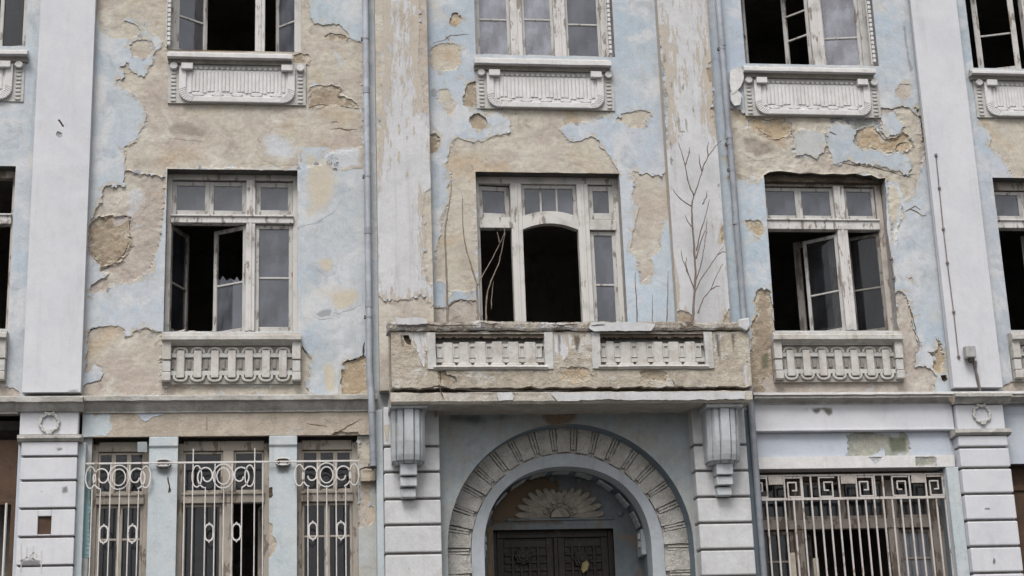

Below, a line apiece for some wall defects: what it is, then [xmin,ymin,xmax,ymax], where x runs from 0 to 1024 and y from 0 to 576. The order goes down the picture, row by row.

peeling [704,48,717,137]
peeling [82,0,694,396]
peeling [745,220,764,239]
peeling [718,84,937,231]
spalling [750,286,774,393]
spalling [931,335,947,382]
peeling [846,432,937,466]